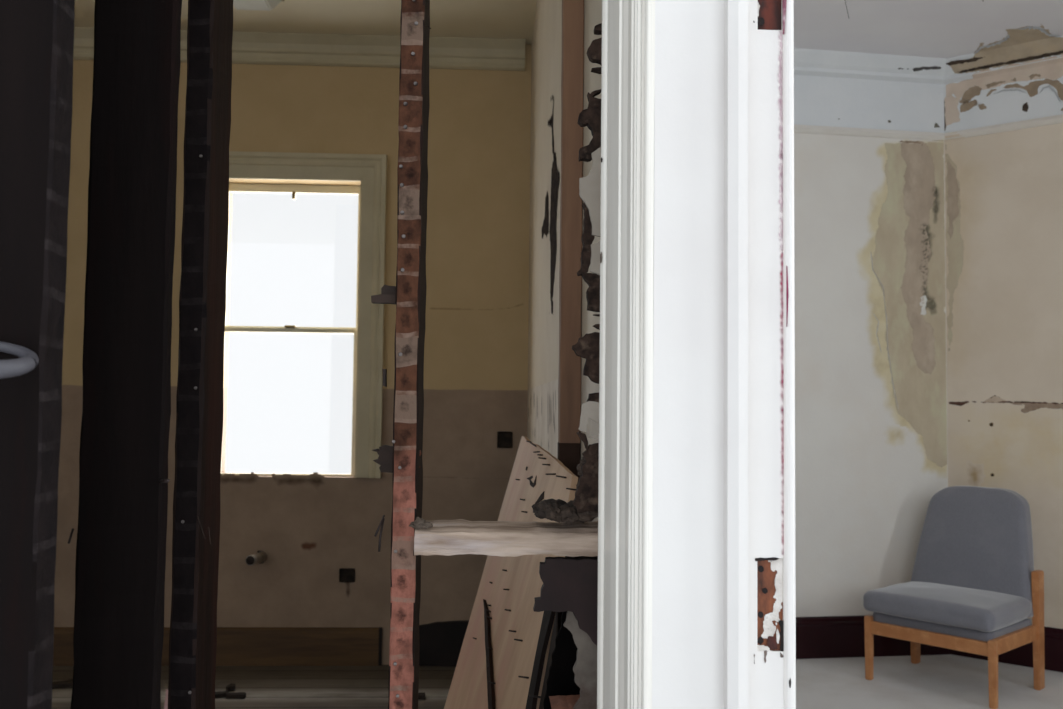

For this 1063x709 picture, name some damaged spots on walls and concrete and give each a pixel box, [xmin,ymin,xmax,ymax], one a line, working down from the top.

flaking render [586,23,602,74]
flaking render [944,24,1063,131]
flaking render [572,89,603,512]
damp [854,132,1063,502]
peeling [757,558,783,651]